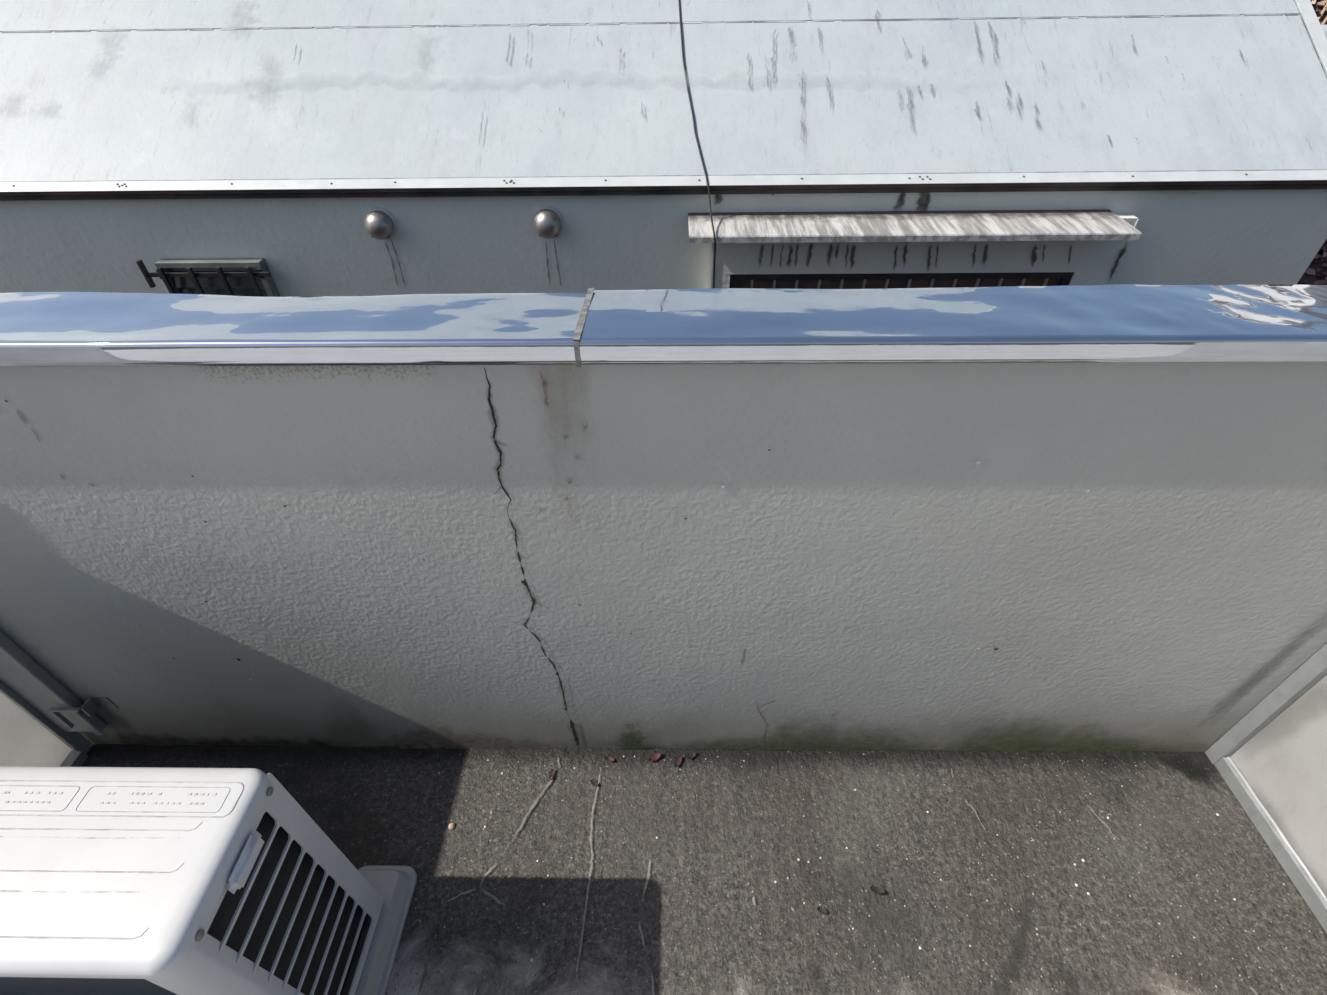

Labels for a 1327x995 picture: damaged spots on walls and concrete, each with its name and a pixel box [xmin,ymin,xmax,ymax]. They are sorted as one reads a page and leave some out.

water stain [895,193,930,210]
water stain [759,244,813,266]
water stain [828,243,856,267]
crack [447,368,601,995]